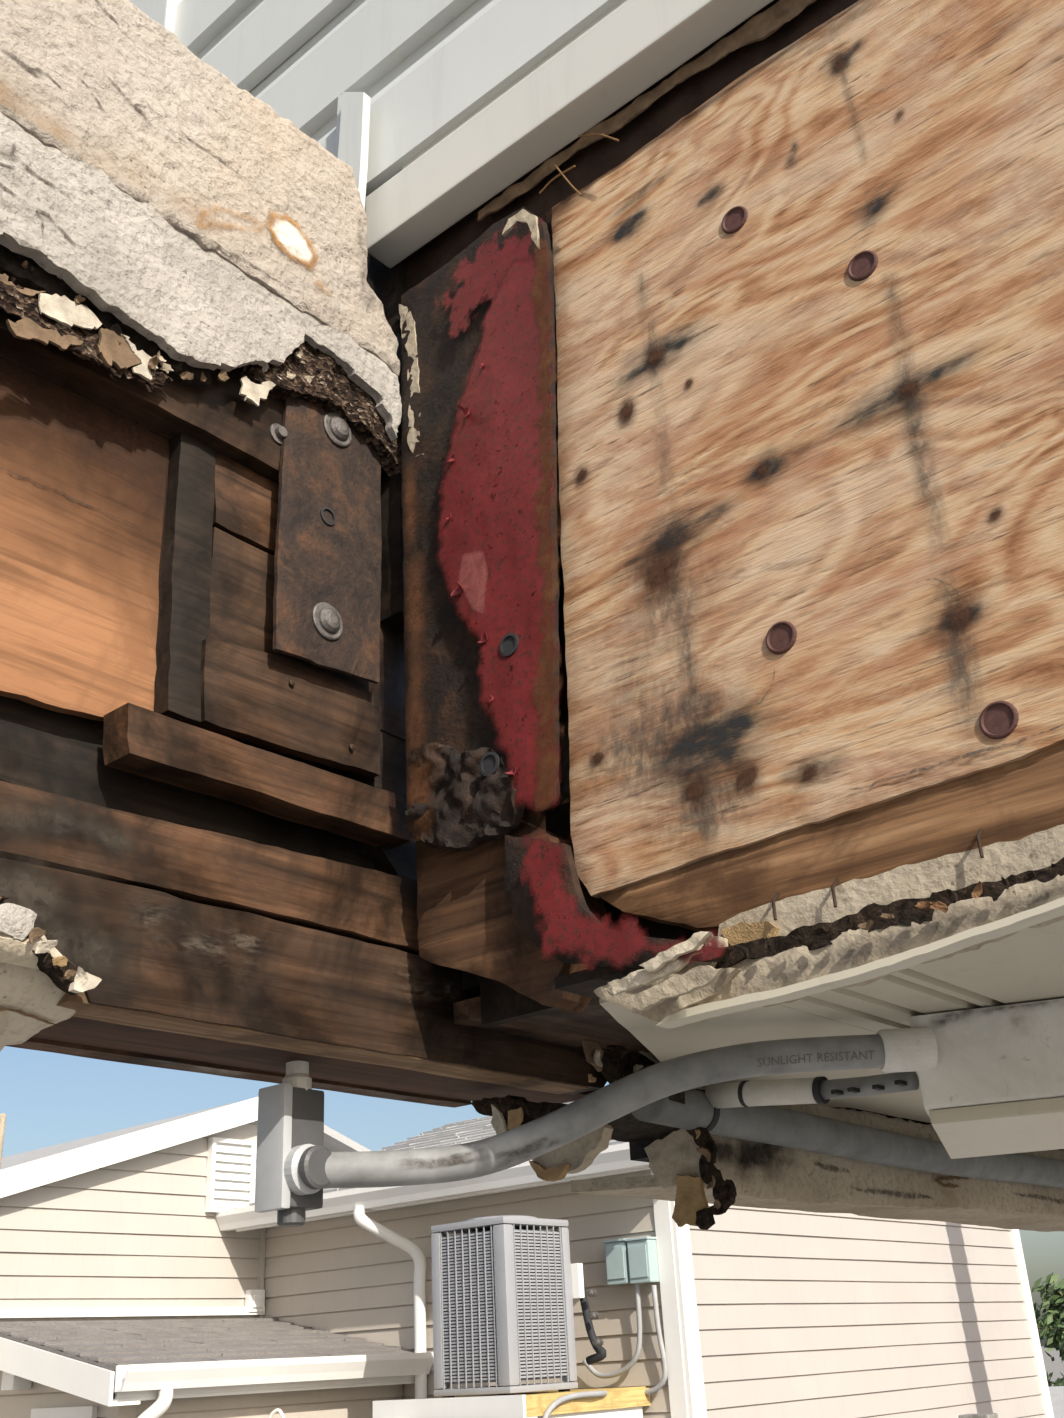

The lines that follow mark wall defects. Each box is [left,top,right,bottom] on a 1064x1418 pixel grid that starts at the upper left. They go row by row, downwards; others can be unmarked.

damp [832,41,861,79]
crack [11,54,243,177]
crack [0,146,74,243]
corrosion [268,212,317,269]
spalling [0,244,402,479]
damp [851,352,973,424]
peeling [435,219,561,810]
damp [627,506,726,594]
damp [591,690,758,830]
spalling [0,896,102,995]
peeling [520,838,725,968]
crack [0,1007,56,1025]